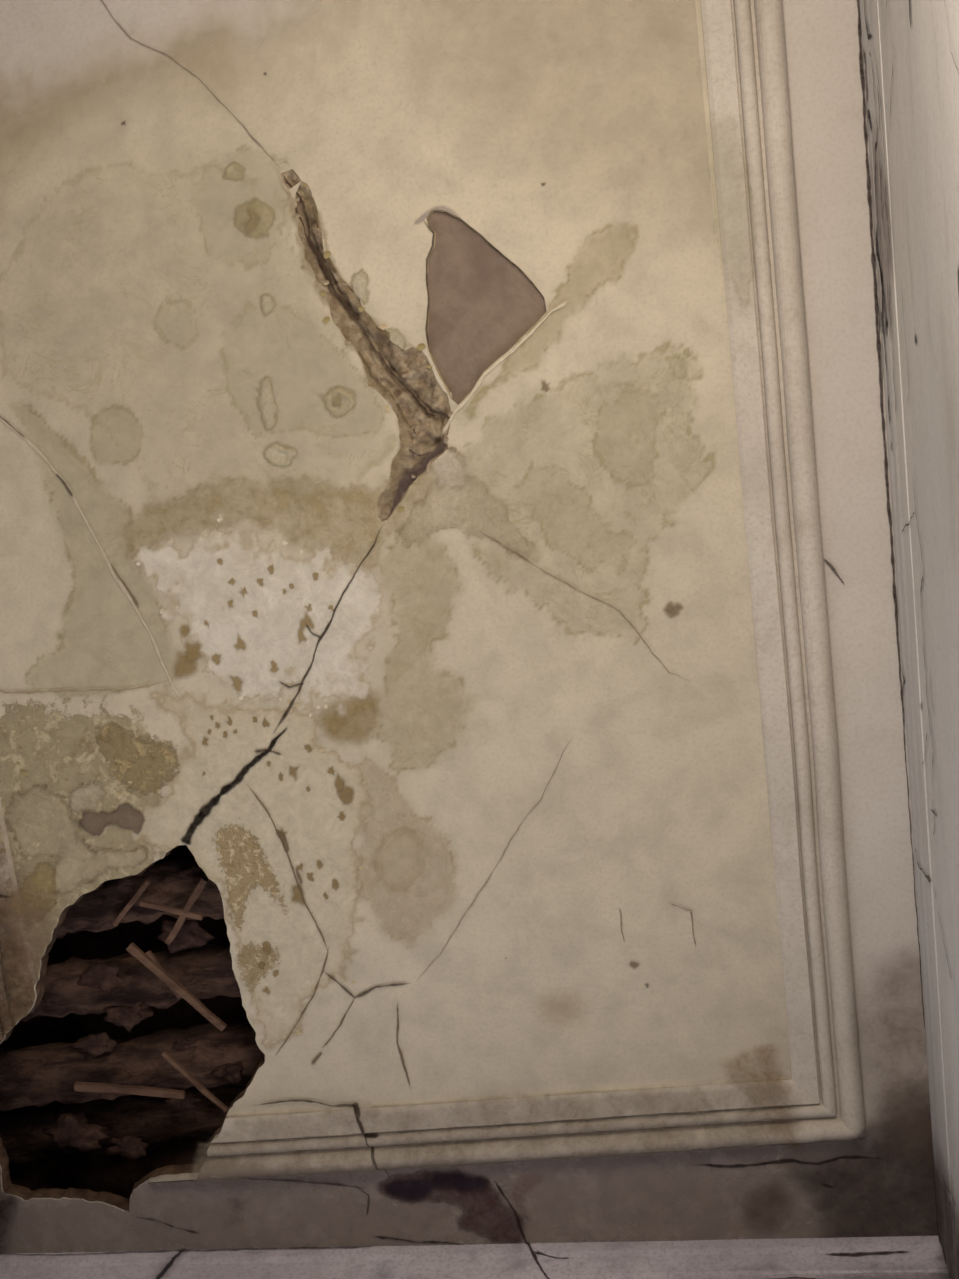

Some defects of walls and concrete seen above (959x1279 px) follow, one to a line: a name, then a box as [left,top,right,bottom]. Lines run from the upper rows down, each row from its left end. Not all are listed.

crack [101,0,262,147]
spalling [415,207,566,432]
crack [0,416,176,694]
crack [182,169,563,1086]
leakage [0,0,790,1137]
crack [857,0,951,1027]
peeling [0,514,382,1211]
crack [0,1099,462,1279]
leakage [0,1088,959,1279]